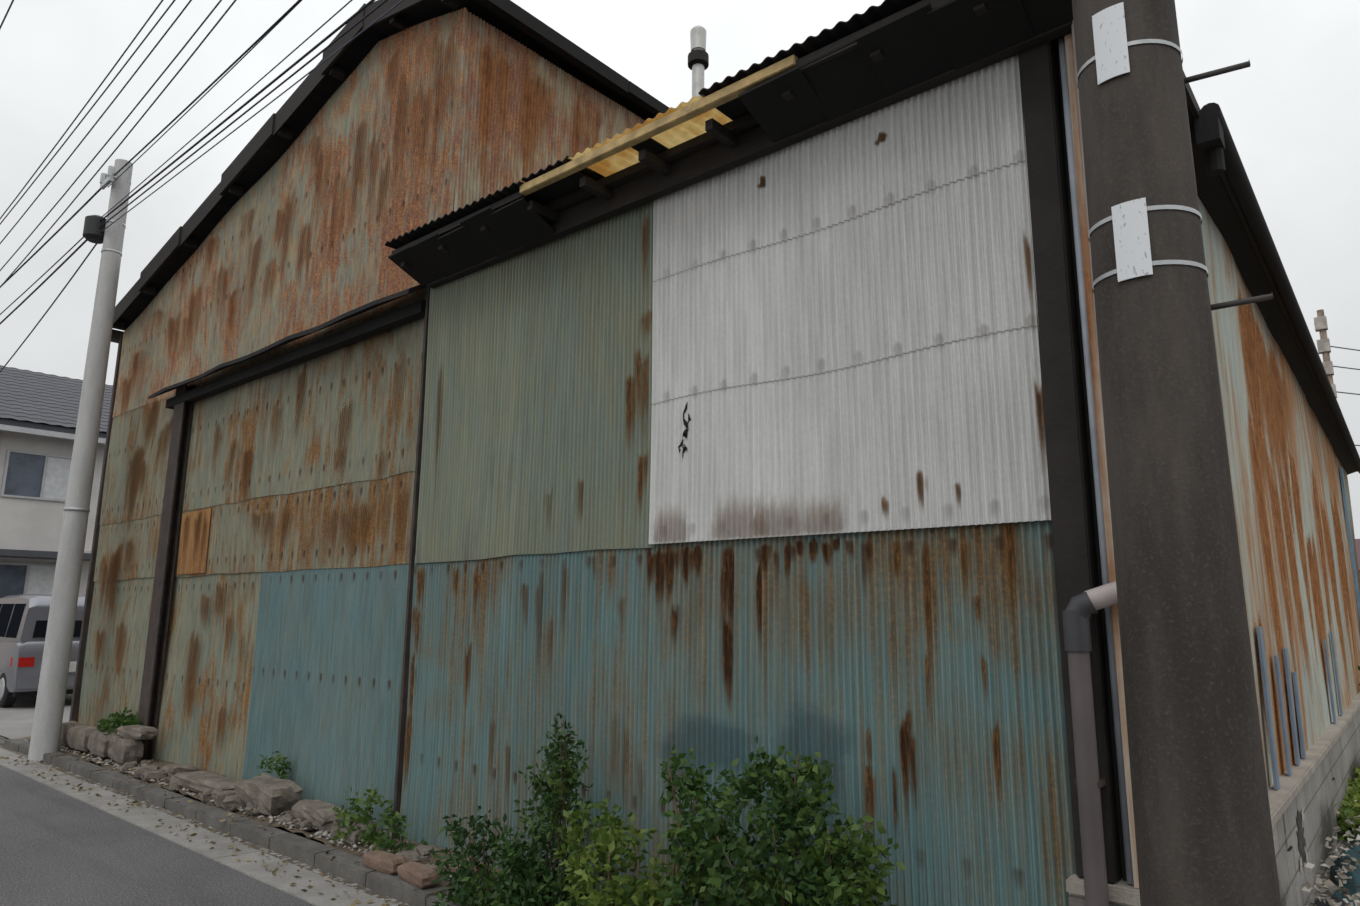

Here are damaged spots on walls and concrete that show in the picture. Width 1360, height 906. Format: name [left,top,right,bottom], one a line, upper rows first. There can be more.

rust [626,353,649,434]
rust [176,508,212,575]
rust [405,569,425,773]
rust [637,456,647,505]
rust [646,545,702,635]
rust [721,547,734,700]
rust [756,537,871,632]
rust [921,542,932,704]
rust [1004,523,1016,583]
rust [1238,297,1352,723]
rust [865,730,875,829]
rust [892,712,916,826]